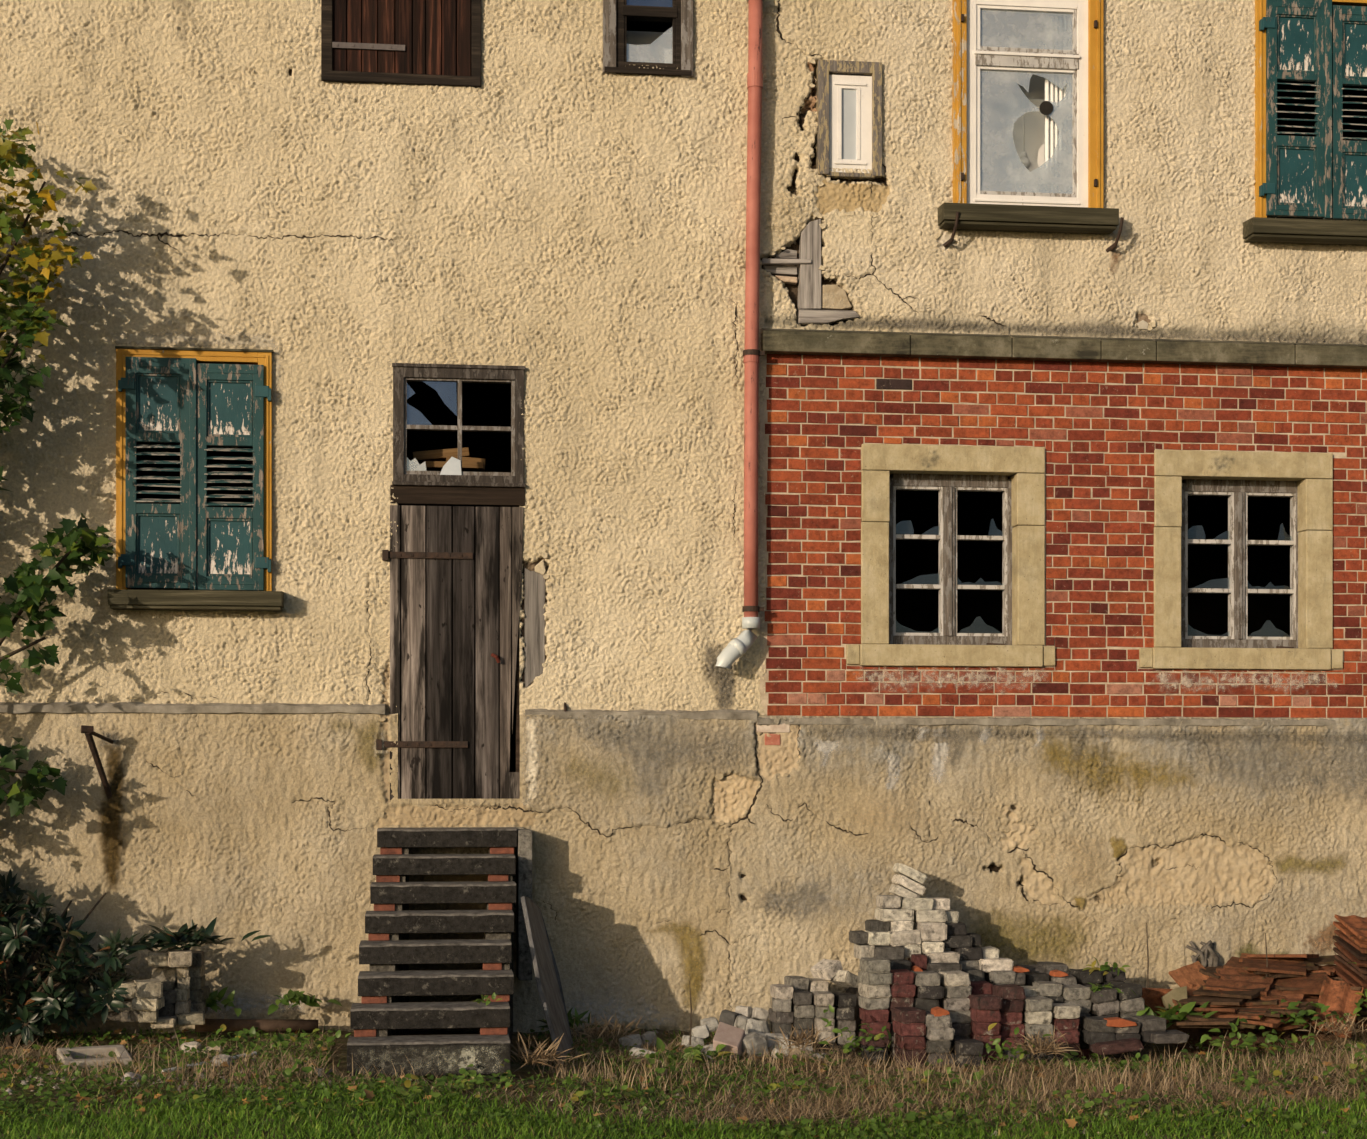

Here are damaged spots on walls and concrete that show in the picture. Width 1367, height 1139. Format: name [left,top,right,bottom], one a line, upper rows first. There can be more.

crack [776,0,824,126]
peeling [801,59,817,114]
crack [46,230,402,252]
flaking render [760,165,890,327]
flaking render [524,552,549,688]
crack [292,797,363,831]
peeling [710,723,801,825]
damp [818,726,1367,791]
crack [432,725,868,1010]